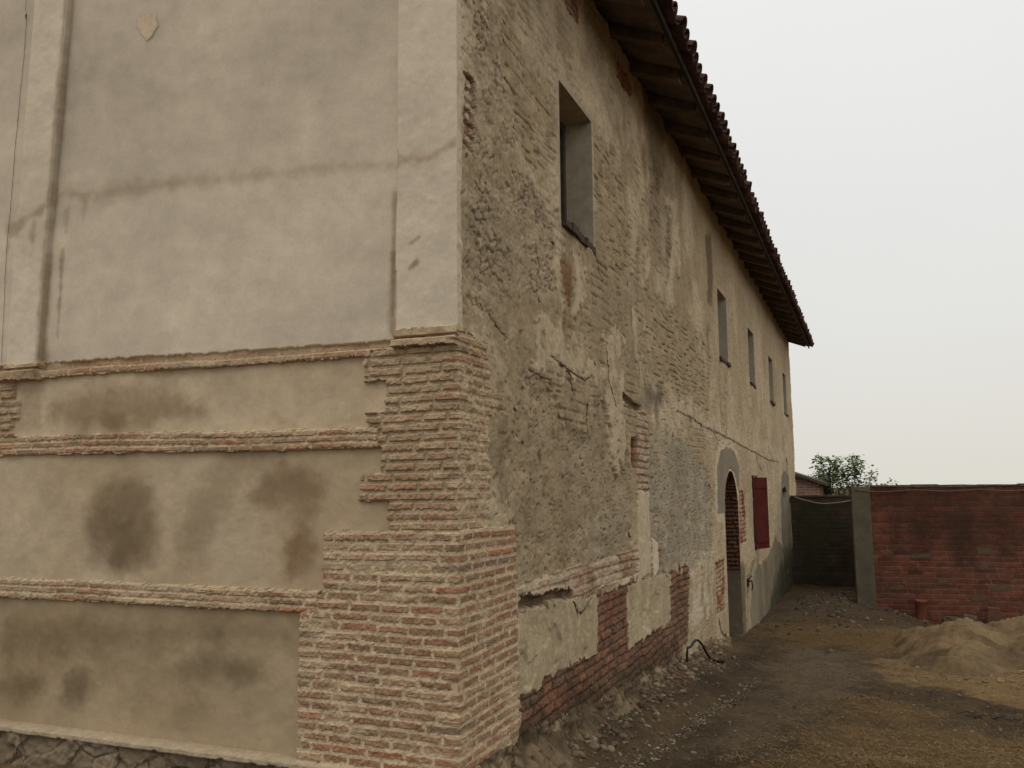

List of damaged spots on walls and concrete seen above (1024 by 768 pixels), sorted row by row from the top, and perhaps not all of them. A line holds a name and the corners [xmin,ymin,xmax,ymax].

crack [529,347,617,433]
flaking render [517,424,726,735]